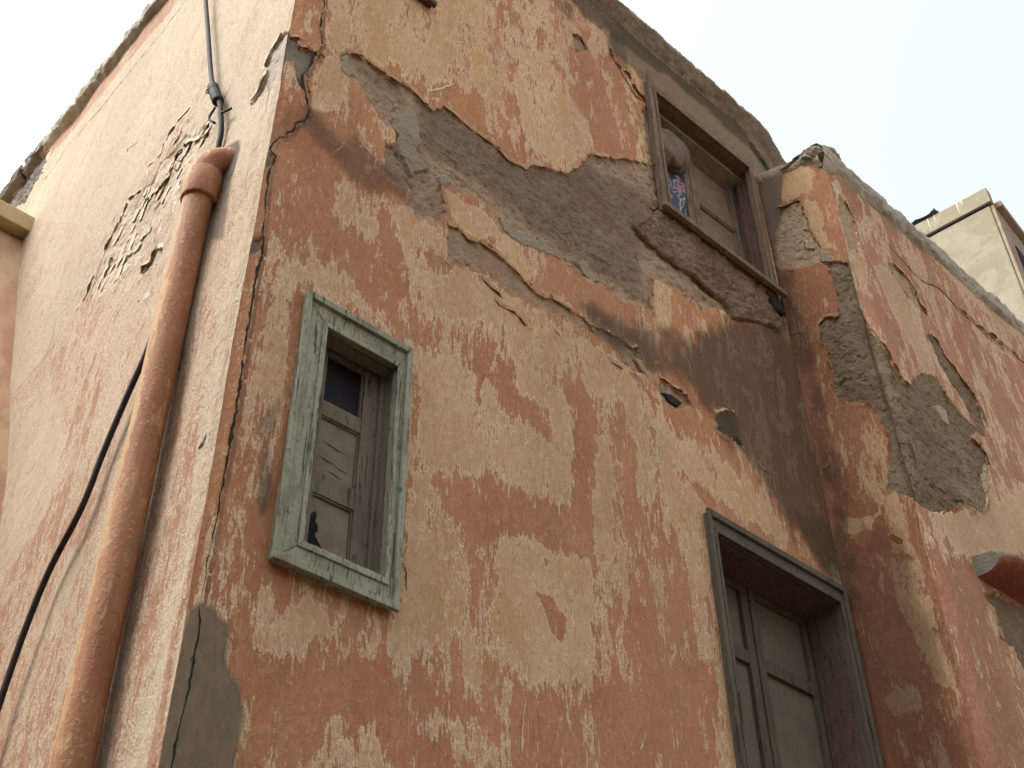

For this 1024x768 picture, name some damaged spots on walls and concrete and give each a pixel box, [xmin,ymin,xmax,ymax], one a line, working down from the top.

peeling [249,32,325,105]
peeling [76,105,213,310]
crack [171,0,328,768]
peeling [339,47,753,404]
peeling [708,407,742,445]
peeling [774,193,992,520]
crack [879,233,1024,363]